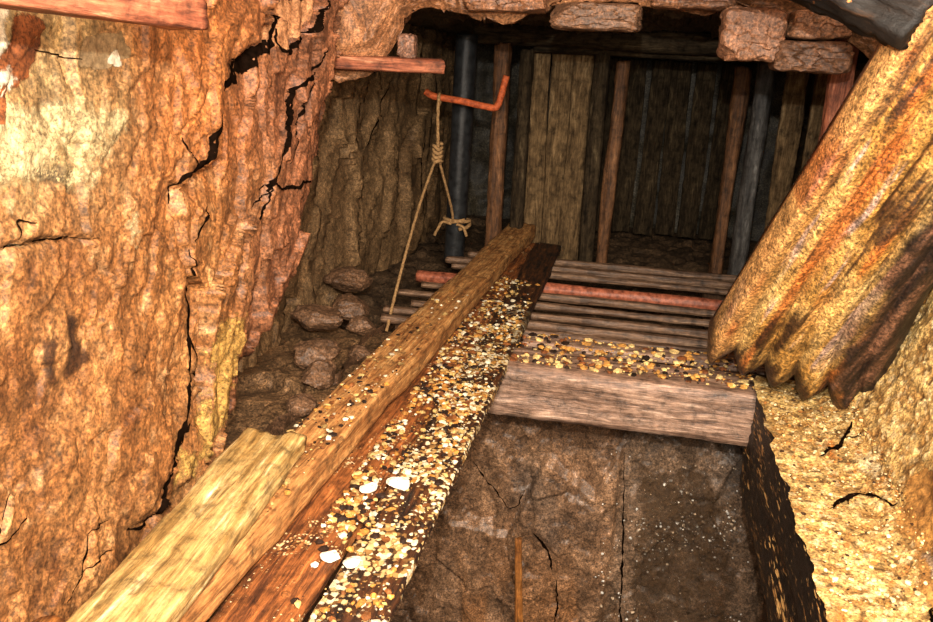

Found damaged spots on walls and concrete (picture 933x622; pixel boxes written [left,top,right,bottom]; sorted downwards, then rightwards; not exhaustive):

crack [167,0,331,220]
crack [3,219,95,249]
crack [67,207,210,603]
crack [820,421,861,456]
crack [830,493,897,509]